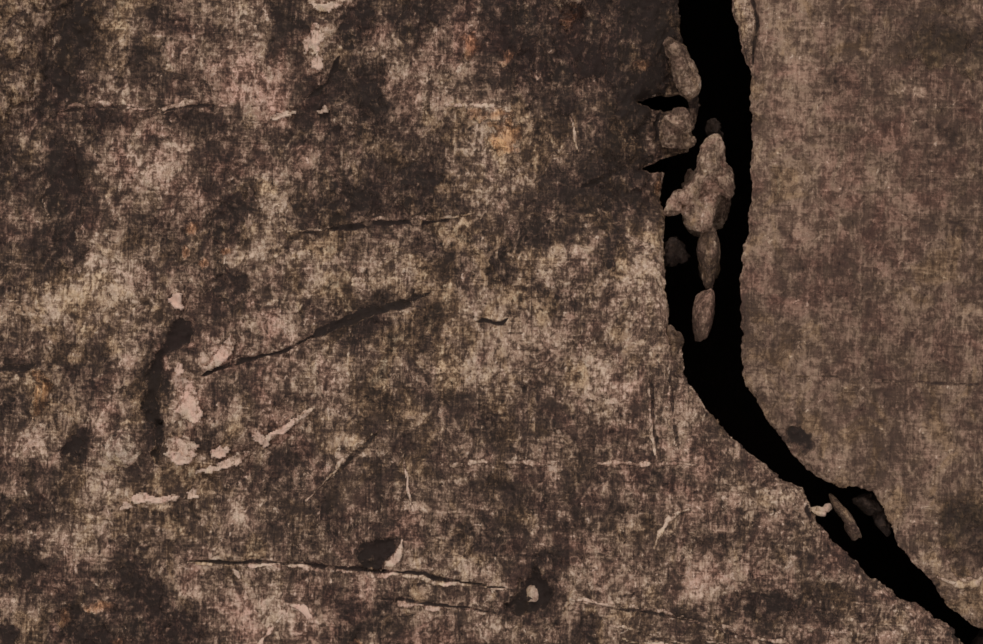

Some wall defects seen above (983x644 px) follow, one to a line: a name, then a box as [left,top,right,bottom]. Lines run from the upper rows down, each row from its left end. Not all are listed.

crack [572,597,791,644]
crack [625,0,982,644]